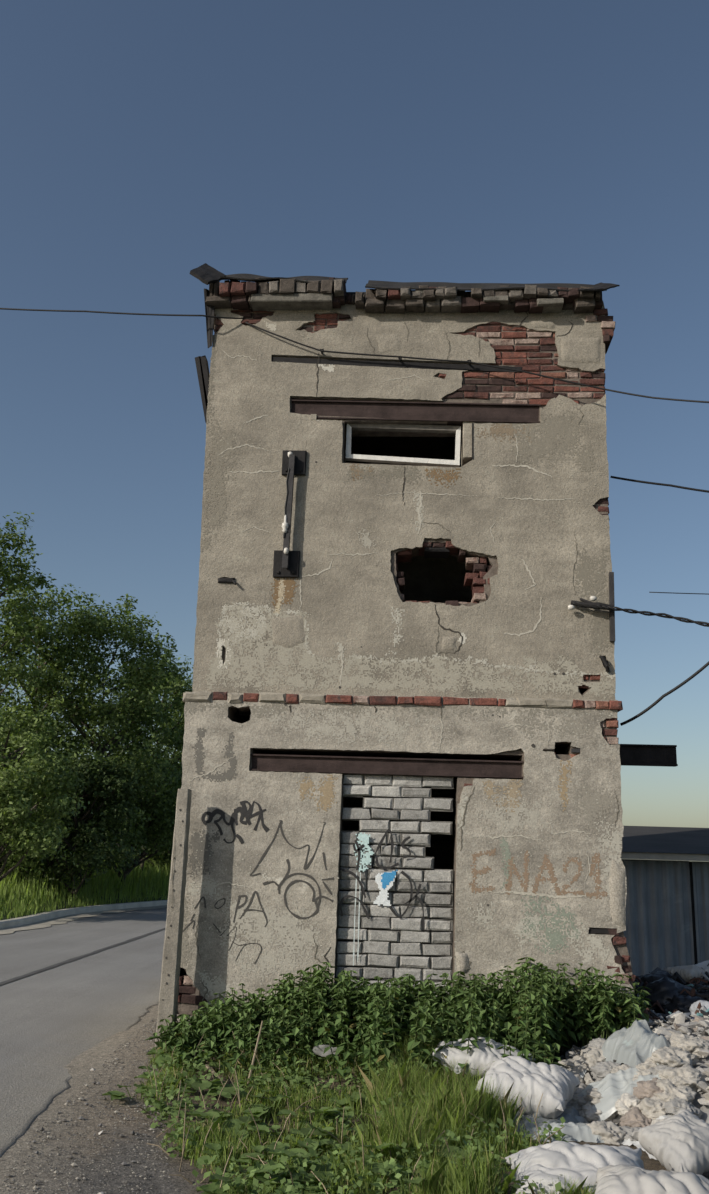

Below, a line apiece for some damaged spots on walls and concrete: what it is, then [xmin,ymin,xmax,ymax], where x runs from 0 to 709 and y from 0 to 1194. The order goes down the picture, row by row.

spalling [299,313,351,333]
spalling [443,321,606,405]
spalling [585,308,616,354]
spalling [593,498,609,515]
rust [271,577,299,613]
spalling [396,541,492,606]
crack [434,604,463,654]
crack [504,559,542,636]
peeling [199,601,616,745]
spalling [600,718,619,745]
peeling [567,821,636,984]
peeling [166,881,319,1015]